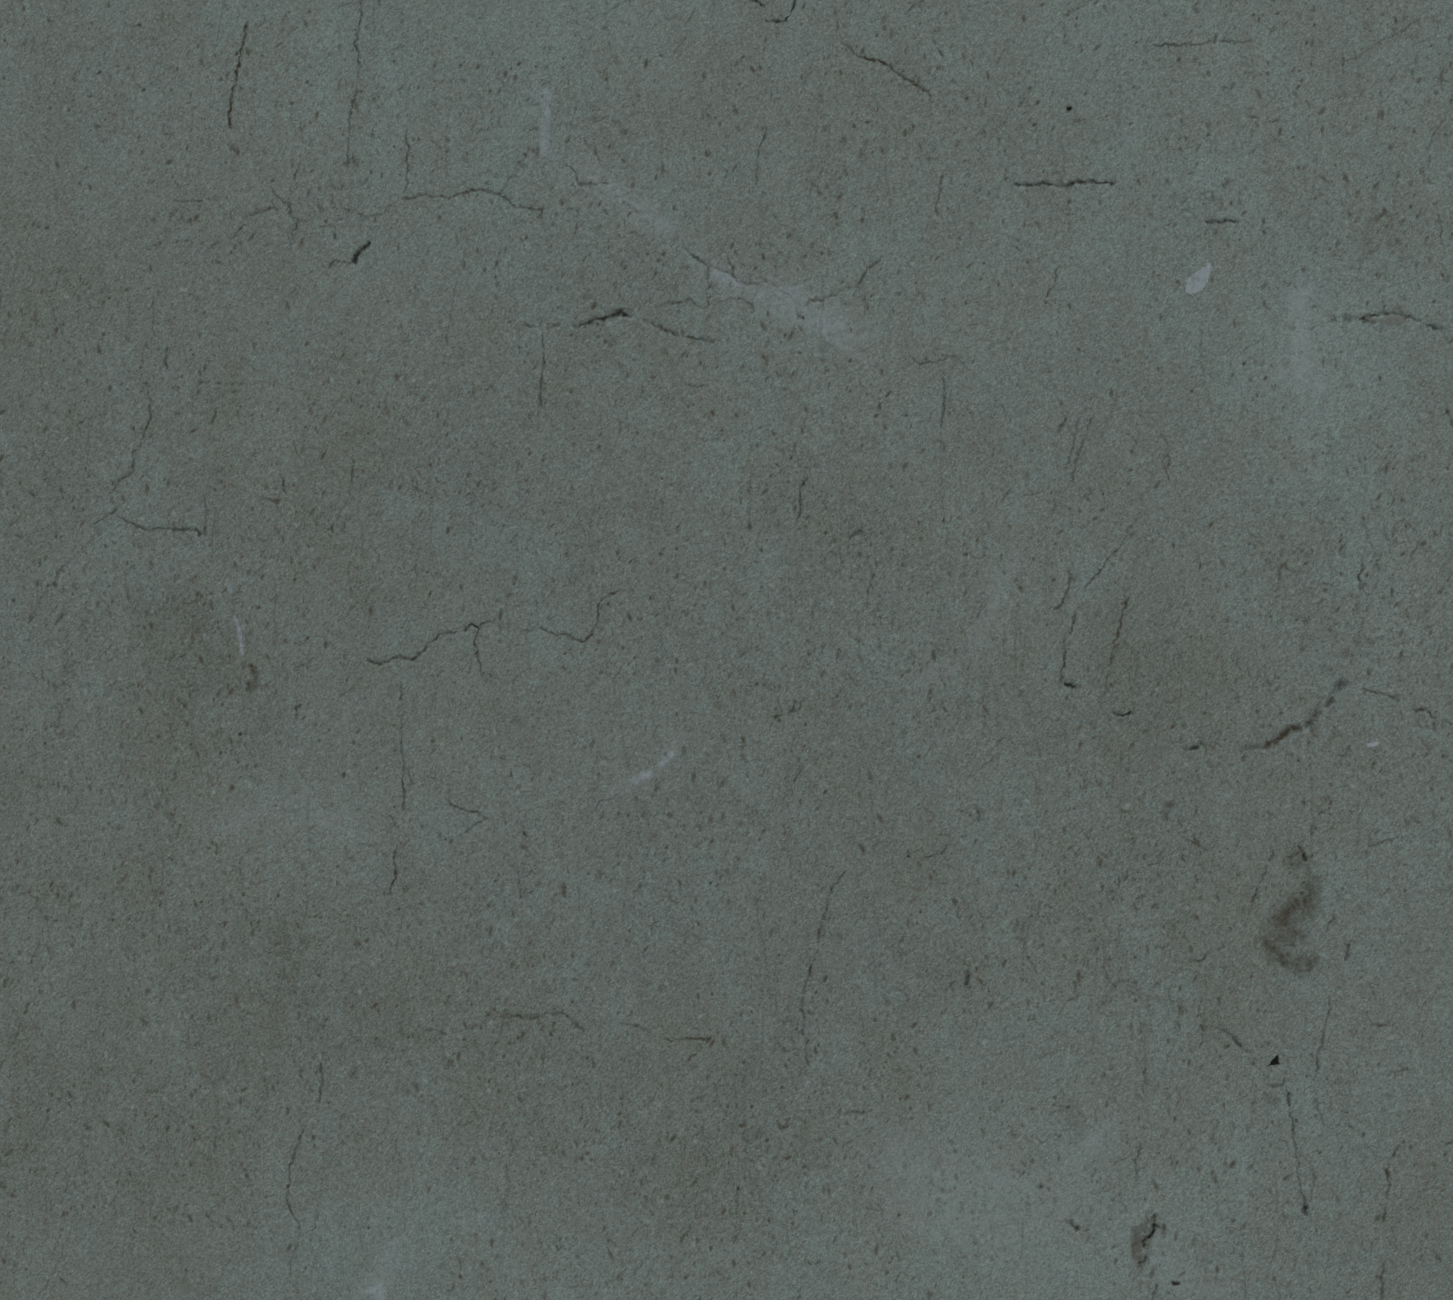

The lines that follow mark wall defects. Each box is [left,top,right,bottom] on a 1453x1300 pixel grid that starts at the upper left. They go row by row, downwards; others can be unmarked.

crack [228,25,247,126]
crack [1017,179,1113,187]
crack [587,310,627,324]
crack [1266,720,1312,746]